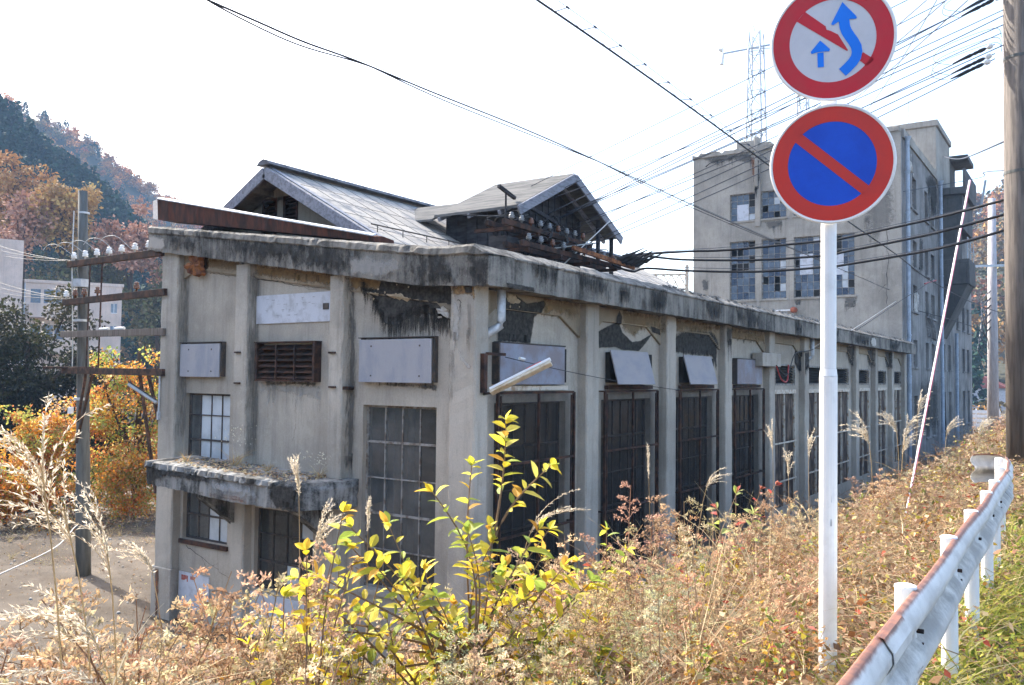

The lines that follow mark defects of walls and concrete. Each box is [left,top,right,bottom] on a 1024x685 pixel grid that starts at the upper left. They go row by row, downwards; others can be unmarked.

spalling [370,284,410,302]
water stain [498,262,579,343]
water stain [578,270,668,351]
water stain [146,467,252,496]
water stain [270,484,294,510]